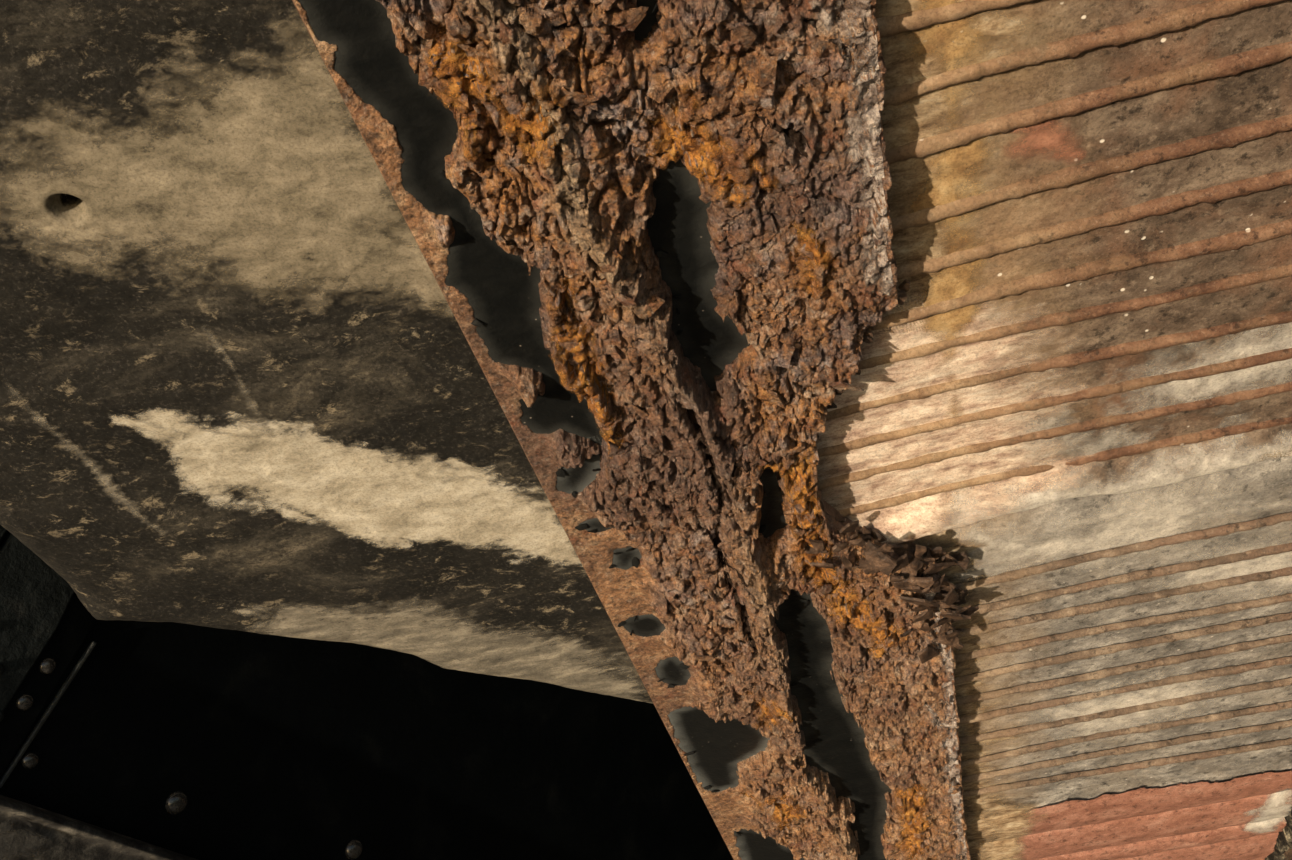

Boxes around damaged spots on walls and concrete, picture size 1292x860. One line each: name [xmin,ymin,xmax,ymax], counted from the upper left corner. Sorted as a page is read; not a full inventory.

corrosion [427,26,565,165]
corrosion [649,93,775,207]
corrosion [552,279,625,458]
peeling [774,316,817,368]
spalling [897,279,910,305]
corrosion [761,452,901,659]
spalling [236,598,714,703]
peeling [749,457,979,860]
peeling [668,706,785,793]
peeling [734,802,804,860]
corrosion [739,792,806,830]
corrosion [894,784,934,860]